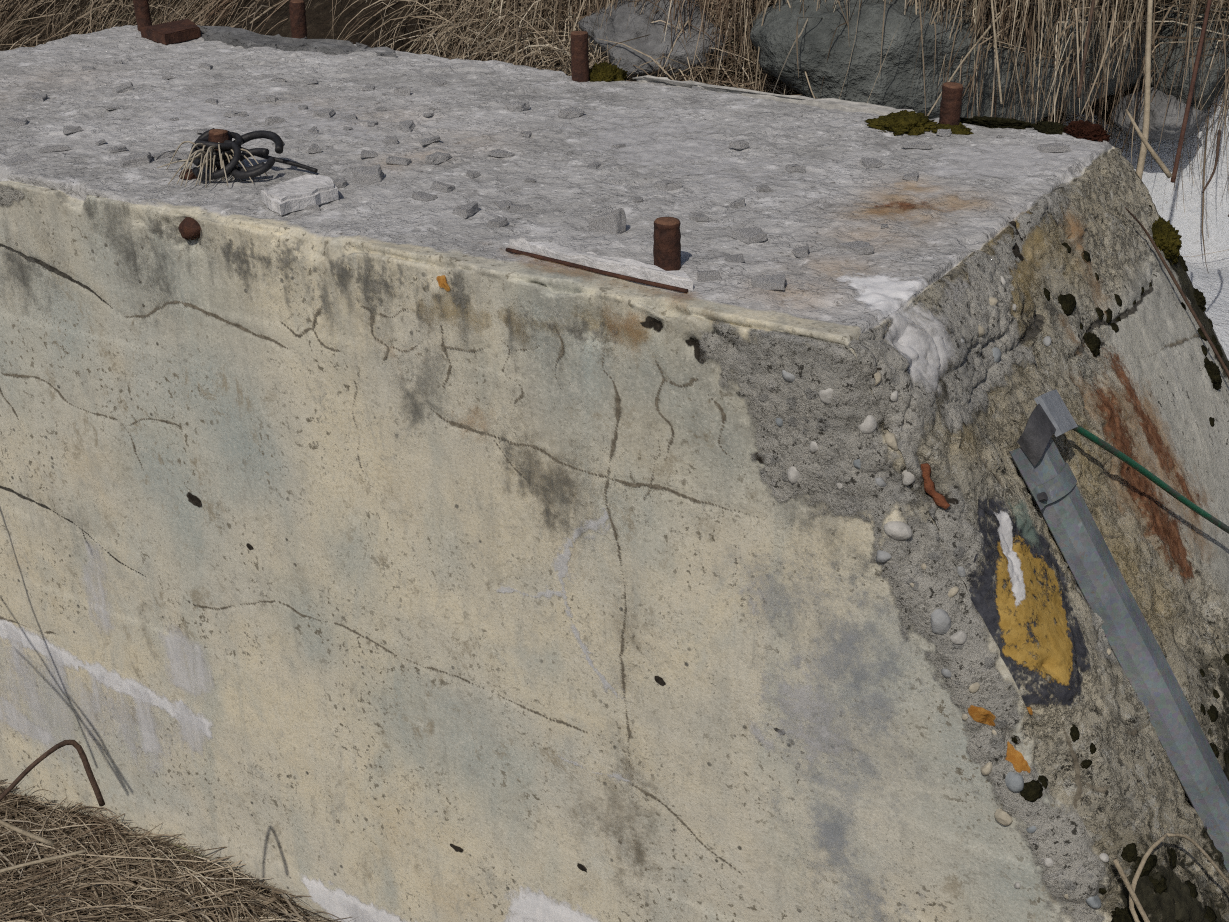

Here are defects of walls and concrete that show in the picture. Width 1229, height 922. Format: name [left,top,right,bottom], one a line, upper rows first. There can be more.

spalling [859,157,885,169]
crack [0,244,339,353]
crack [0,373,177,463]
rust [1091,348,1200,580]
crack [0,486,146,577]
crack [193,600,587,733]
crack [361,306,747,878]
spalling [697,183,1109,922]
spalling [1075,580,1144,706]